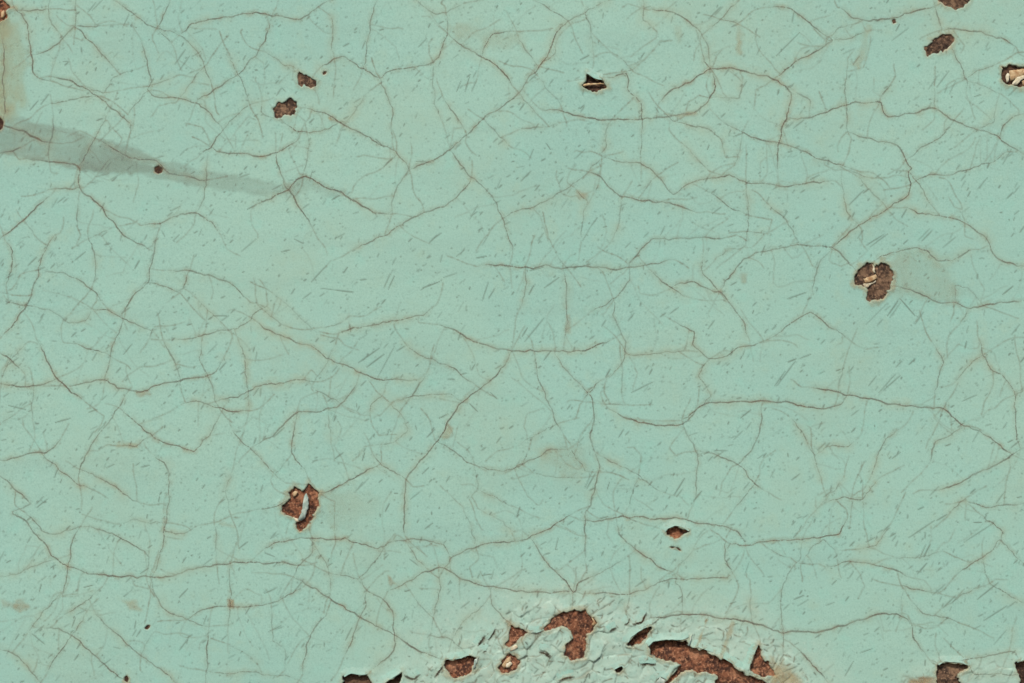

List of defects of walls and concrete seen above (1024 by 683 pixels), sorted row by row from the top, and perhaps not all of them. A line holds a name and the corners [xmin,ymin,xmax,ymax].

crack [439,9,562,105]
crack [2,55,162,237]
crack [173,86,395,245]
crack [665,50,818,162]
crack [838,150,968,243]
crack [8,350,77,395]
crack [625,388,965,426]
crack [422,515,844,595]
peeling [528,624,556,658]
peeling [605,609,646,632]
peeling [639,654,669,682]
crack [660,614,846,673]